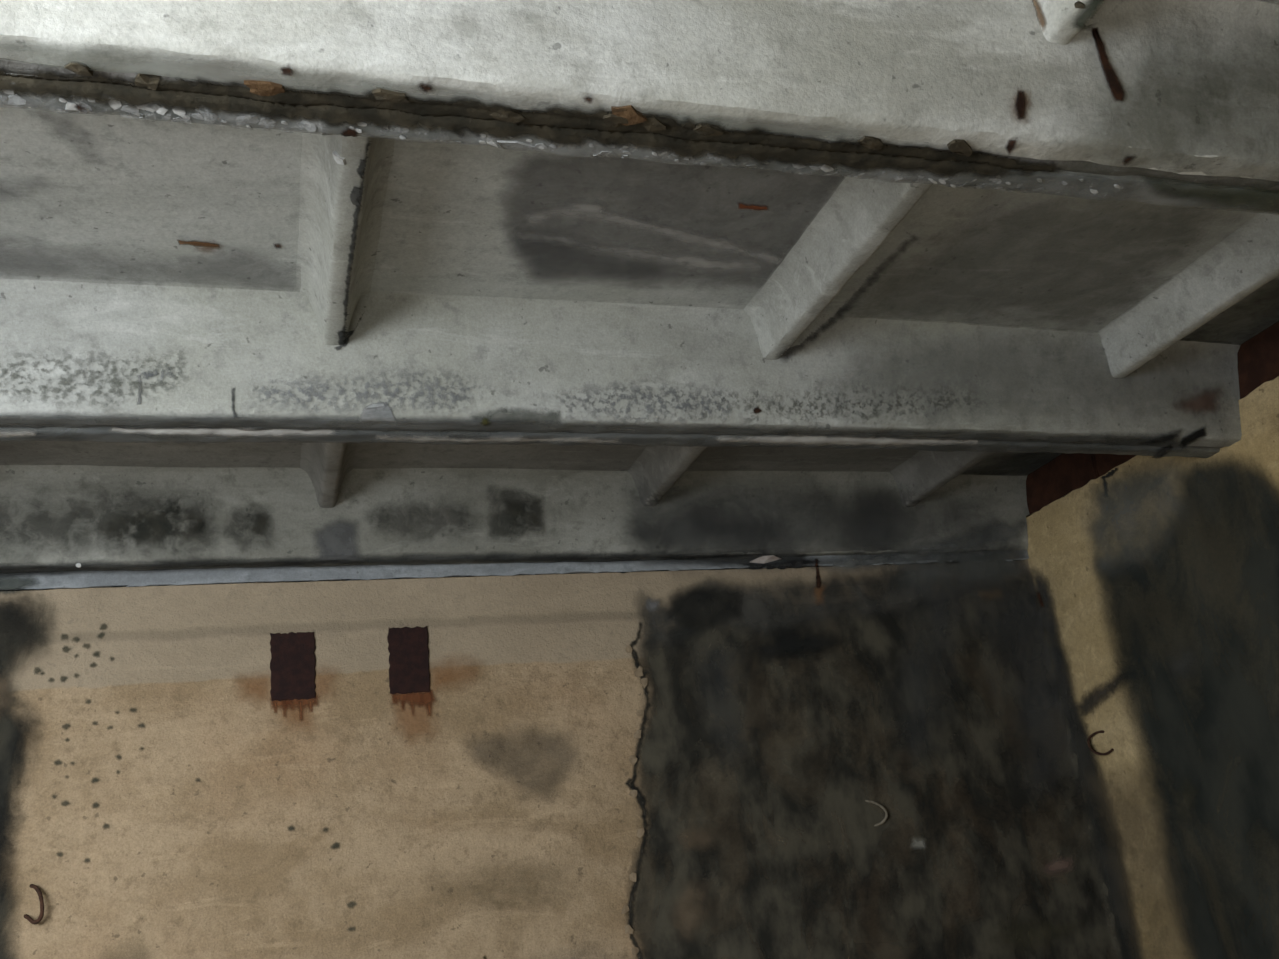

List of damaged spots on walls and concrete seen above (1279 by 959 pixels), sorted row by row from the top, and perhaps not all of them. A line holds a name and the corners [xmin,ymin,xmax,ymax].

rust [1092,28,1124,101]
spalling [0,61,1128,198]
rust [1015,91,1026,119]
water stain [510,157,842,283]
water stain [0,492,213,547]
water stain [230,512,269,545]
rust [247,685,317,720]
rust [392,671,461,730]